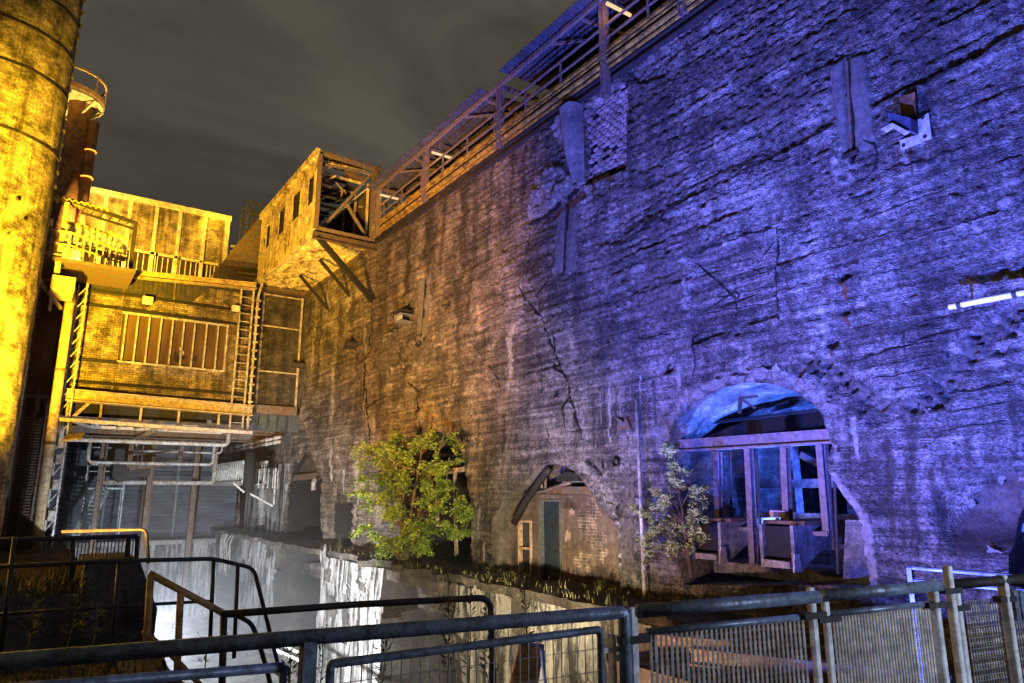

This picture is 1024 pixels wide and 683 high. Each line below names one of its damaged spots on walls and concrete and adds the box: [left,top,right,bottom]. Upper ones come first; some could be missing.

spalling [526,49,672,226]
crack [361,305,386,437]
crack [518,235,582,461]